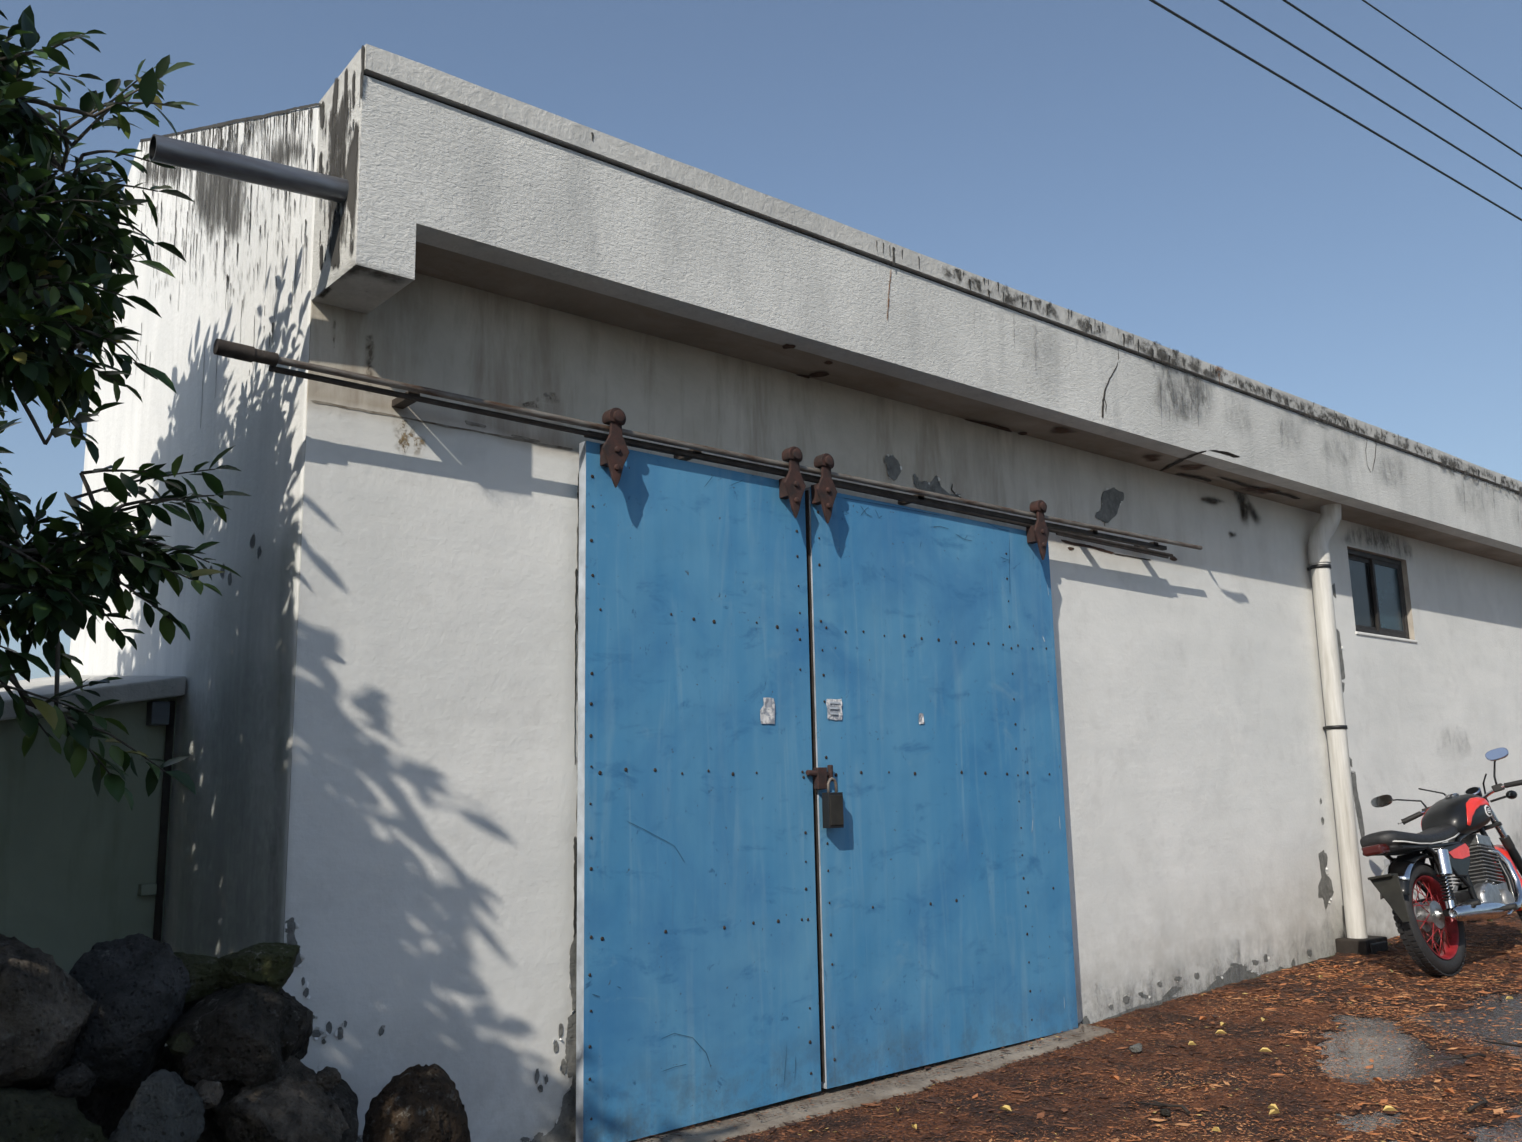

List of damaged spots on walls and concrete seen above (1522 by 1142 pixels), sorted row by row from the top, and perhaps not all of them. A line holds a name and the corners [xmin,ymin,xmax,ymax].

damp [139,45,400,372]
crack [1102,352,1119,417]
damp [946,269,1522,497]
peeling [884,454,961,498]
spalling [1095,487,1124,526]
damp [1230,487,1278,536]
peeling [1318,850,1334,910]
peeling [285,917,347,1044]
peeling [520,933,577,1142]